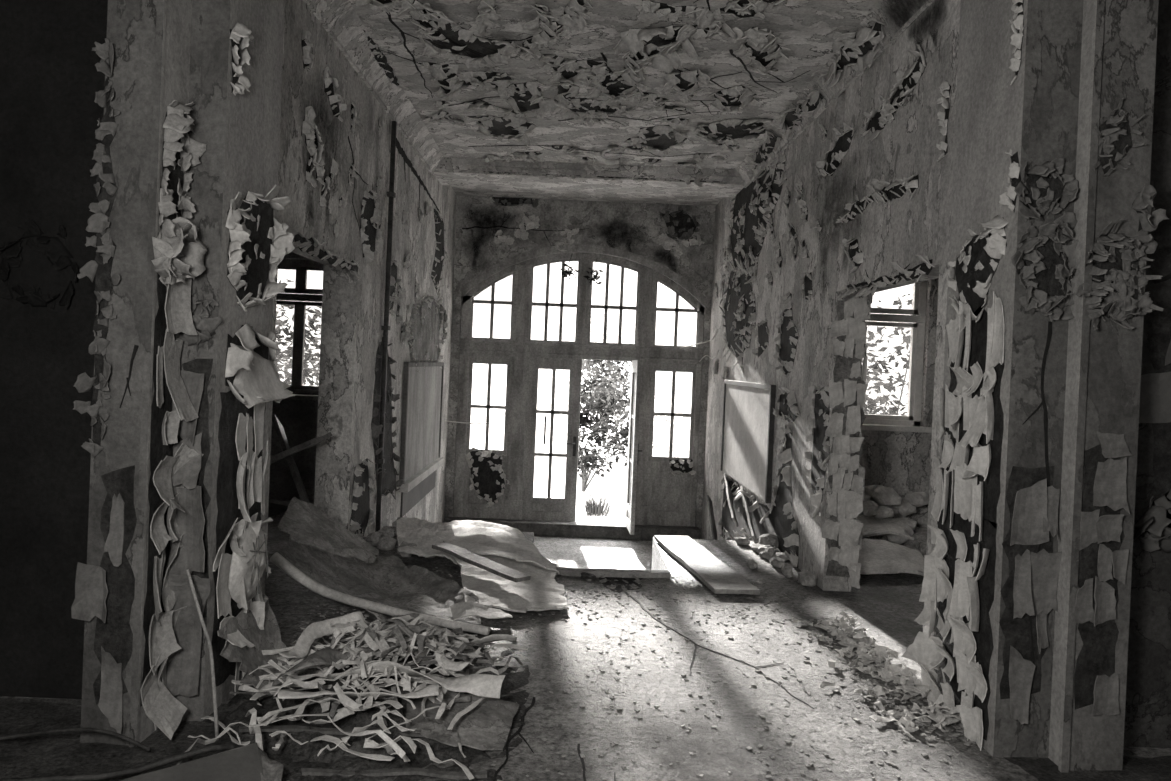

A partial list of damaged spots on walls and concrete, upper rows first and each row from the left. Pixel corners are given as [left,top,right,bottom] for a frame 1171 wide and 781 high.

peeling [71,22,385,740]
peeling [350,0,1171,751]